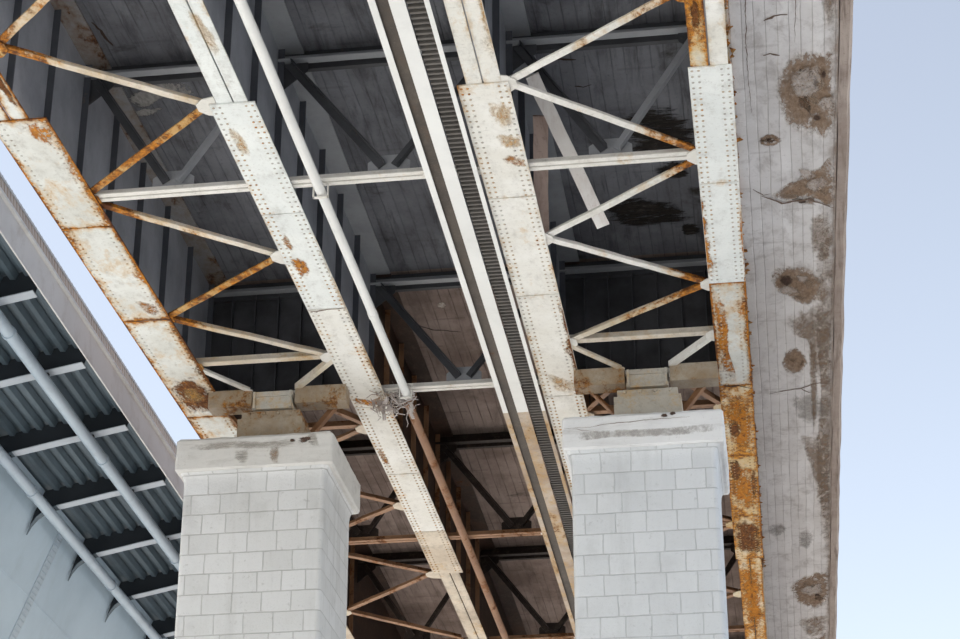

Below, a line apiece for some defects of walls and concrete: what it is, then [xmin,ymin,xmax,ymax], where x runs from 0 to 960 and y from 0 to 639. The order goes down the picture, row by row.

corrosion [688,0,702,34]
corrosion [724,0,736,64]
corrosion [0,78,17,106]
corrosion [502,137,524,165]
corrosion [283,237,309,276]
corrosion [701,200,713,269]
corrosion [172,328,215,412]
corrosion [714,297,735,377]
corrosion [727,218,766,629]
water stain [791,270,833,538]